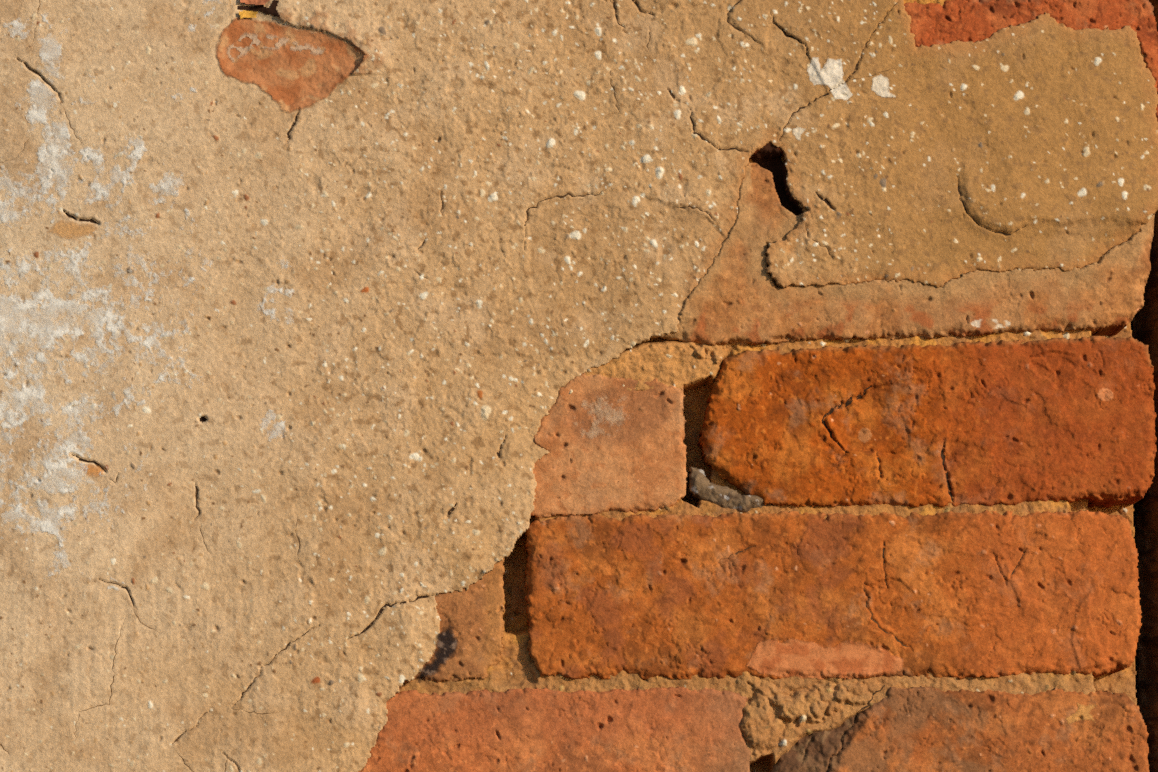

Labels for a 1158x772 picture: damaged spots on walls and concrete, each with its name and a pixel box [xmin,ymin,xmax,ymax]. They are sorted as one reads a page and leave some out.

spalling [217,0,368,112]
crack [610,0,652,49]
crack [727,0,809,57]
crack [779,3,897,141]
crack [669,91,747,152]
crack [524,191,602,250]
crack [348,594,437,639]
crack [75,580,158,741]
spalling [747,639,904,679]
crack [172,625,320,772]